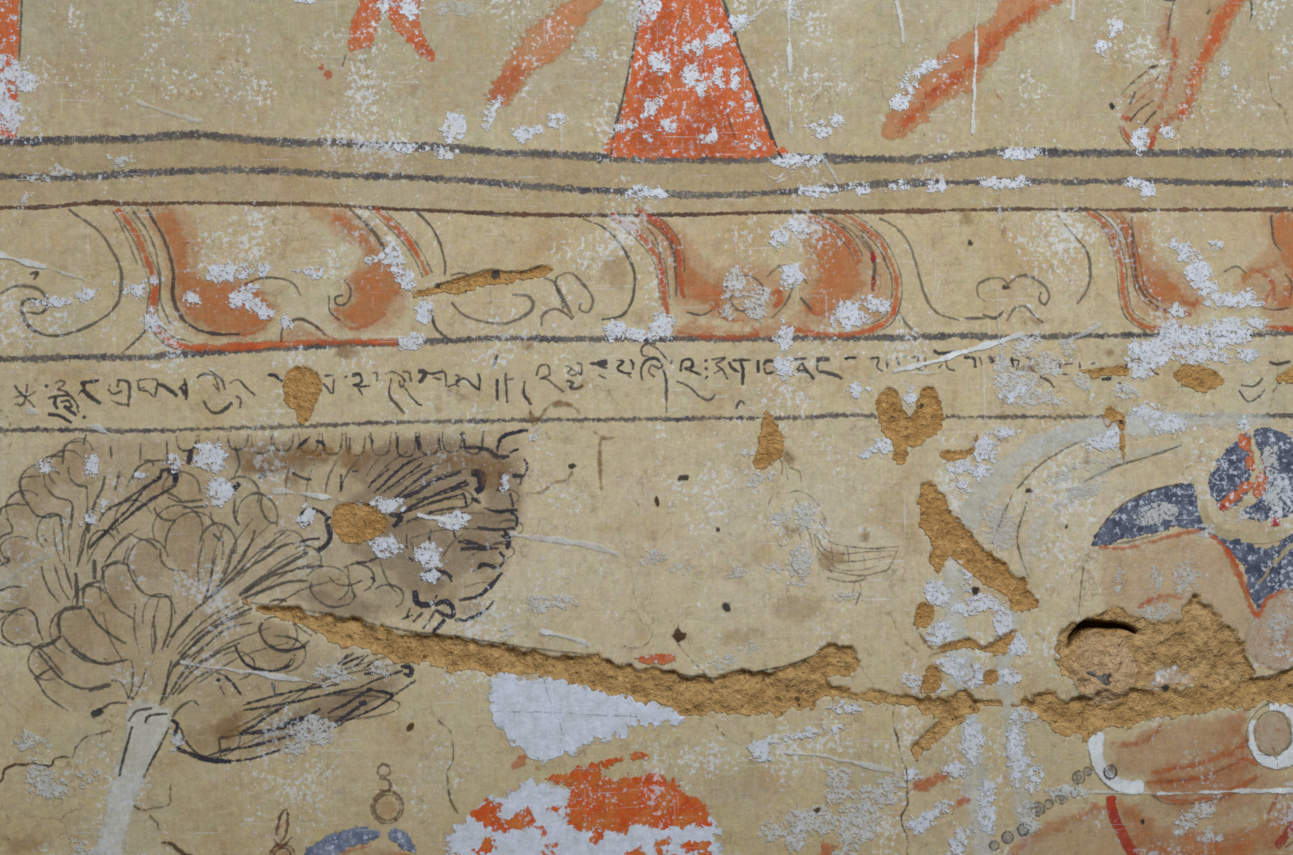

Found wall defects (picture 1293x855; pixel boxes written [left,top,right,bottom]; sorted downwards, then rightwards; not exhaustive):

spalling [364,238,554,351]
spalling [282,365,322,425]
spalling [740,410,784,487]
spalling [846,380,946,465]
spalling [899,426,1039,695]
spalling [993,230,1272,508]
peeling [1131,502,1179,526]
peeling [1191,429,1293,538]
spalling [672,625,687,642]
spalling [1055,555,1257,692]
peeling [280,714,340,761]
peeling [444,672,723,855]